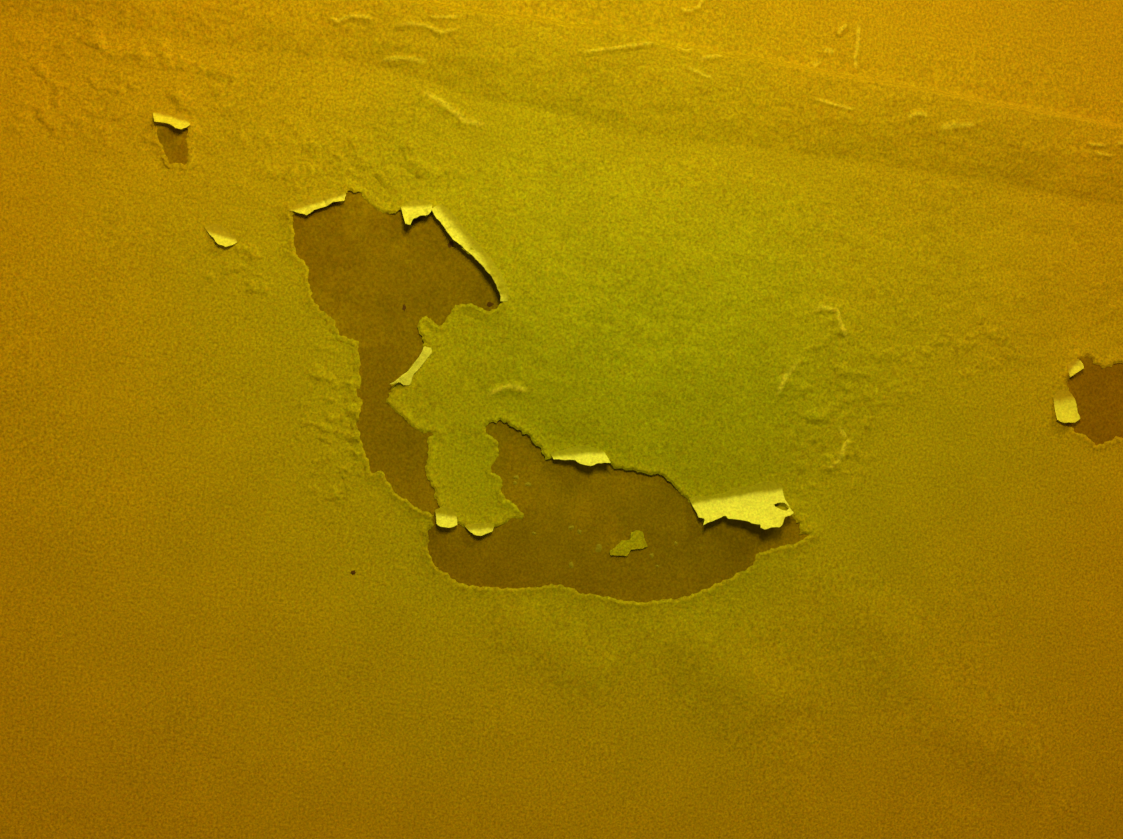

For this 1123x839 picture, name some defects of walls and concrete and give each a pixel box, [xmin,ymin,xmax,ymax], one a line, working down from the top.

peeling [143,111,203,180]
peeling [204,223,237,247]
peeling [268,168,833,620]
peeling [1047,336,1123,464]